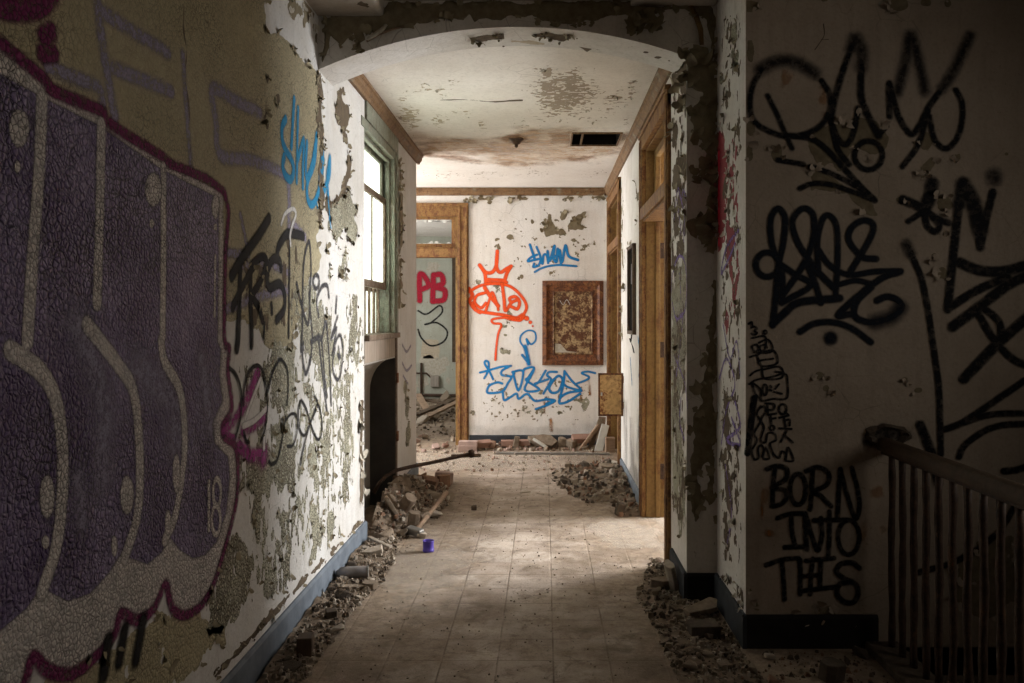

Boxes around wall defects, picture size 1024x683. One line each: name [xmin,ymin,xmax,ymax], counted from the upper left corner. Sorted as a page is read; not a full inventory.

peeling [0,0,786,683]